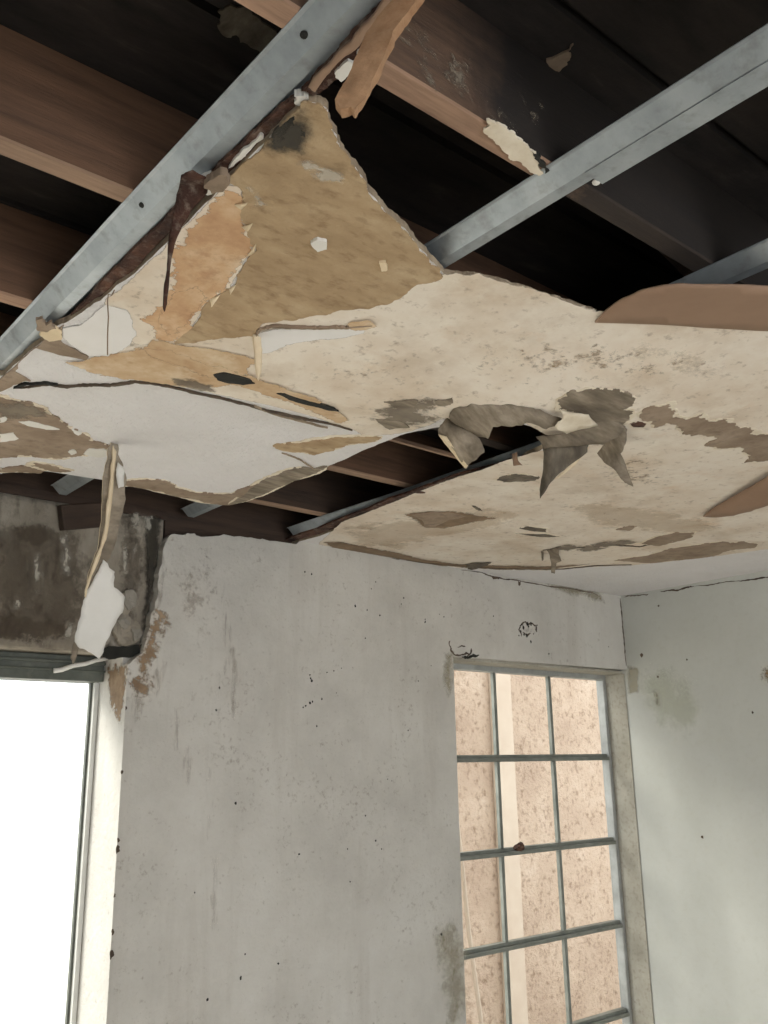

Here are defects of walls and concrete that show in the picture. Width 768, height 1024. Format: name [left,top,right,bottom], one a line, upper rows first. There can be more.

peeling [174,101,443,344]
peeling [0,305,136,474]
crack [13,380,352,431]
peeling [125,434,383,505]
crack [282,452,317,472]
damp [66,185,768,570]
peeling [493,473,540,482]
damp [132,514,161,636]